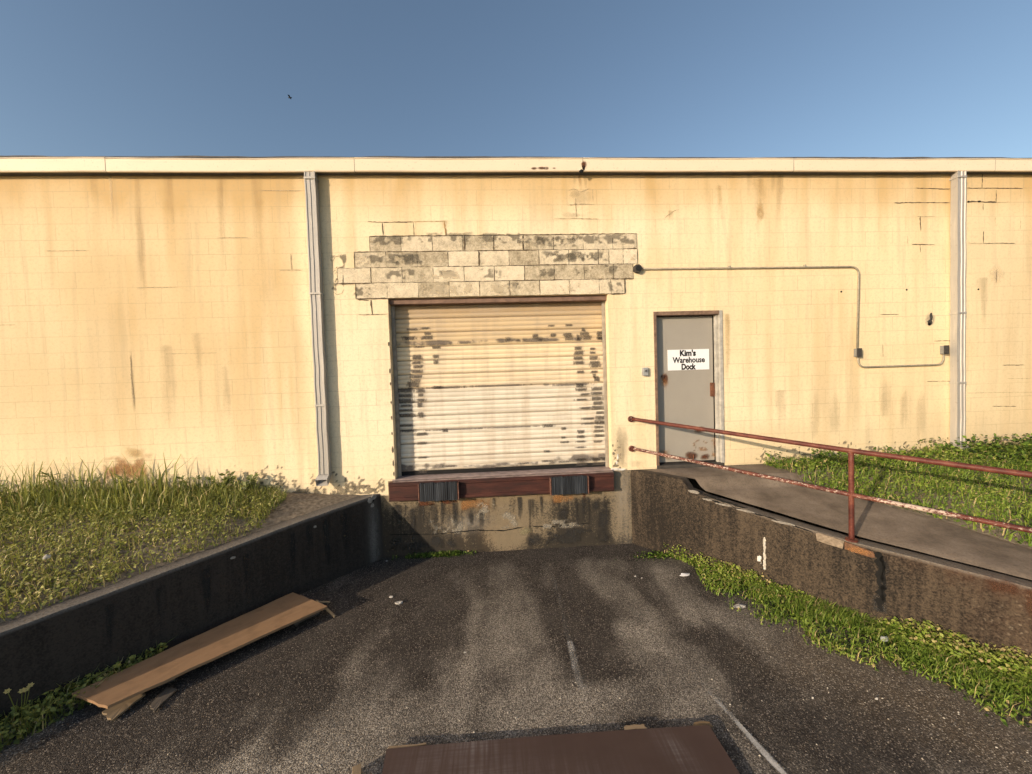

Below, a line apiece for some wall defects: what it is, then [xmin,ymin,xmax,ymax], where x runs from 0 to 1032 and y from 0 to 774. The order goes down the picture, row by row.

crack [895,174,1023,252]
peeling [332,233,638,299]
water stain [390,498,495,550]
water stain [504,497,608,544]